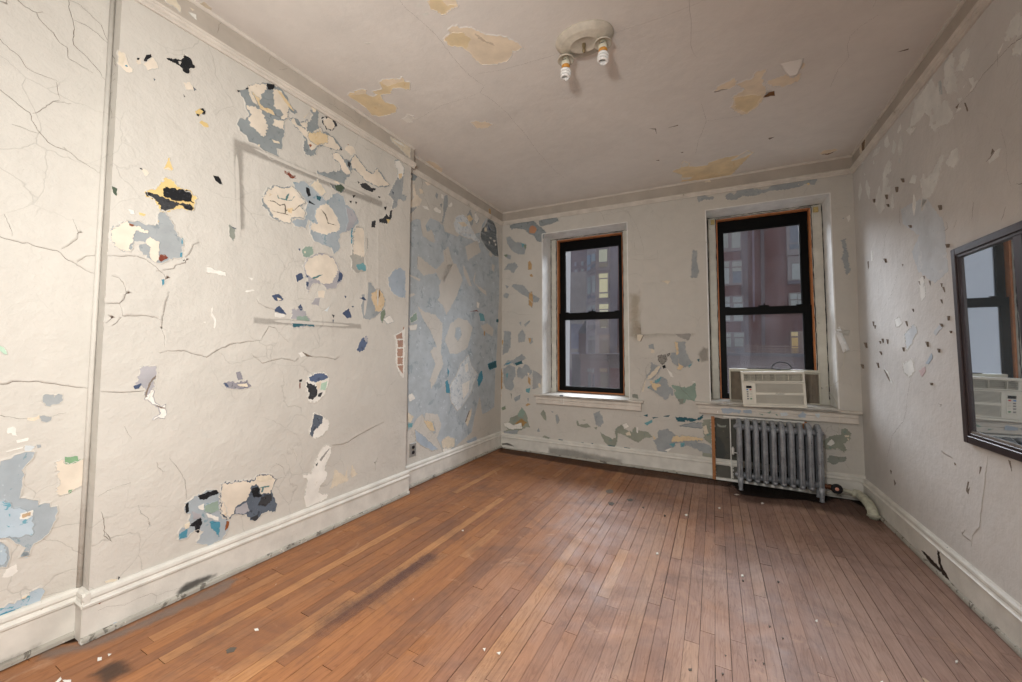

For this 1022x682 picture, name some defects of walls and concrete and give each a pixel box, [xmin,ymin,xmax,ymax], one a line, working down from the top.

crack [0,0,115,175]
peeling [116,50,197,97]
peeling [108,157,199,265]
peeling [236,76,561,452]
crack [0,375,145,421]
spalling [134,364,167,420]
peeling [222,372,252,390]
spalling [299,371,332,508]
peeling [576,334,820,458]
peeling [0,445,83,570]
peeling [176,473,279,546]
peeling [0,585,48,615]